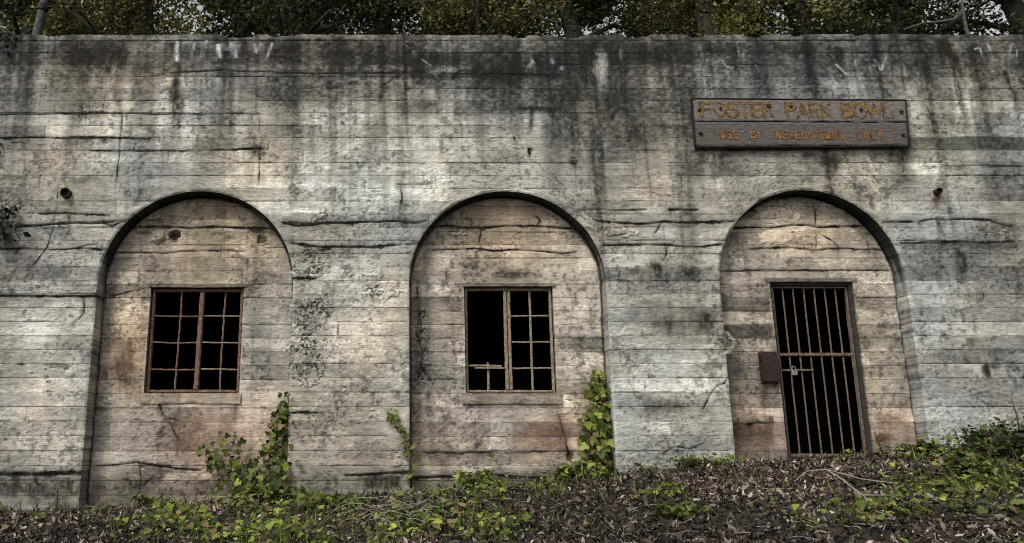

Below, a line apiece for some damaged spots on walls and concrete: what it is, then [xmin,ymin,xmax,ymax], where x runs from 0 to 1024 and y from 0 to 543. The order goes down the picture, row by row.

water stain [937,38,979,87]
water stain [171,62,187,116]
water stain [518,96,564,128]
crack [0,112,260,180]
crack [159,404,180,441]